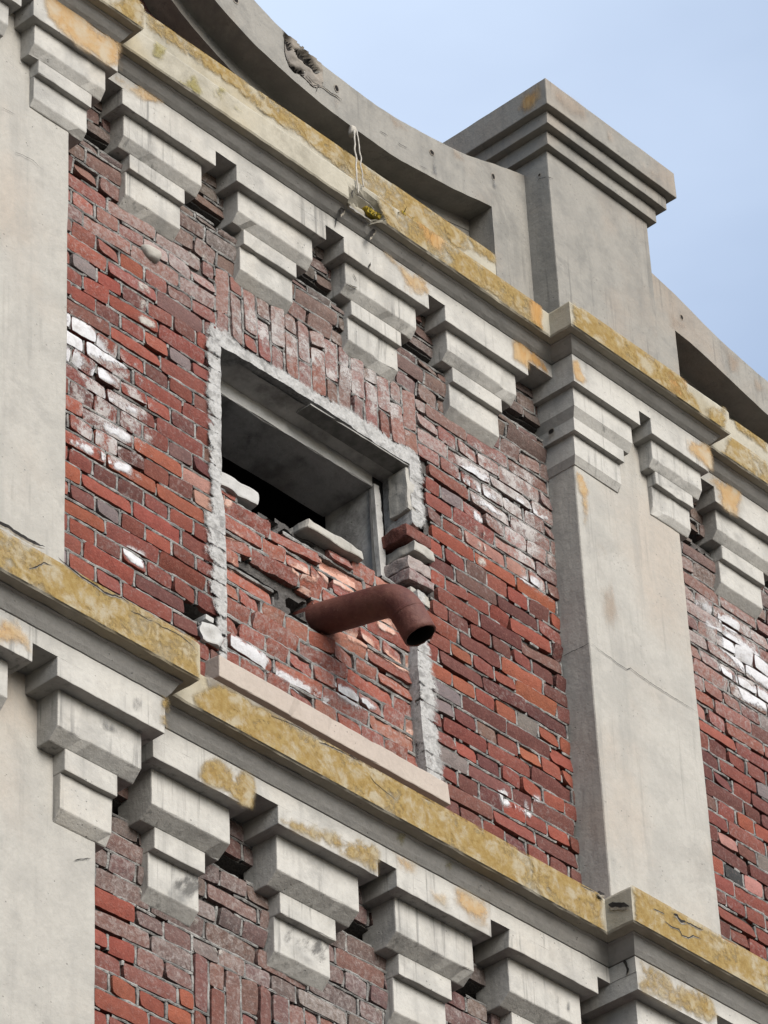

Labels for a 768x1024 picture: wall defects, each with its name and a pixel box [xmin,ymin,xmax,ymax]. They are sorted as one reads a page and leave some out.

spalling [283,33,339,91]
crack [608,902,703,939]